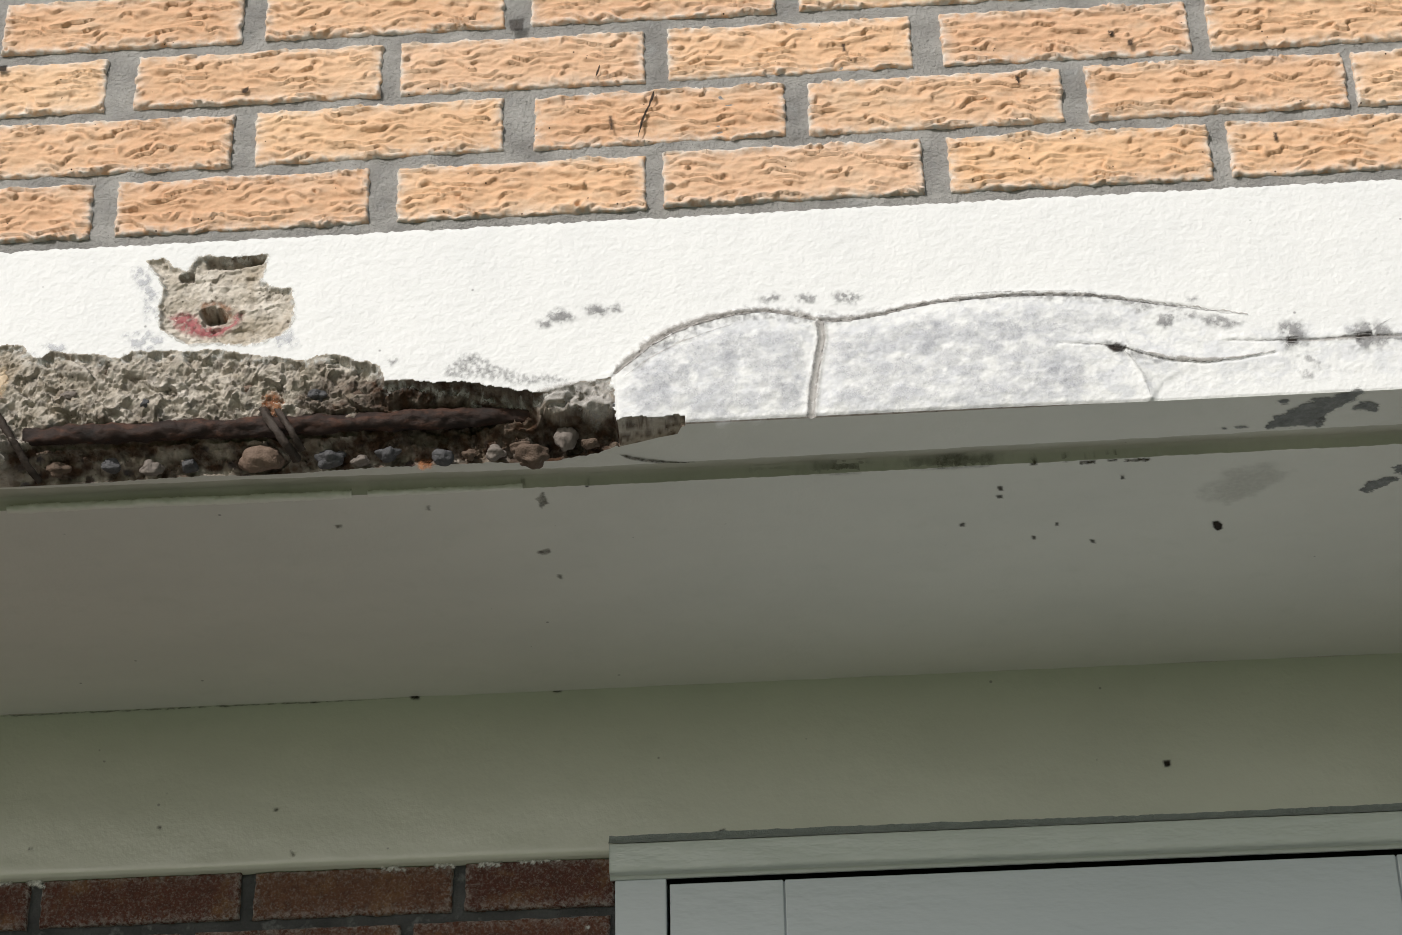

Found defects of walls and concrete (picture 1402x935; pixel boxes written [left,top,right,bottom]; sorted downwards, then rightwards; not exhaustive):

spalling [0,253,685,488]
crack [613,291,1402,419]
peeling [1265,389,1378,429]
peeling [1360,465,1402,493]